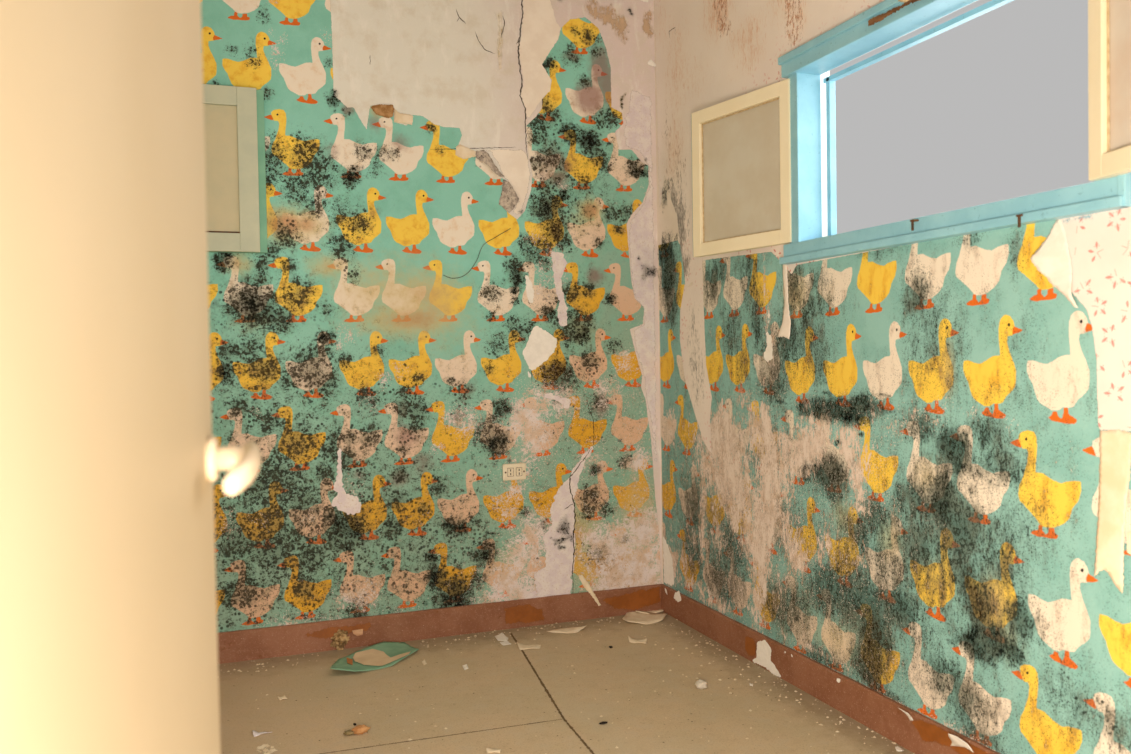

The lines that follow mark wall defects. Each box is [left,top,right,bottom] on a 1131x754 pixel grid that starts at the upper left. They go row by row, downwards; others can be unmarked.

leakage [587,0,653,39]
crack [431,0,528,159]
peeling [519,0,561,118]
leakage [562,126,611,151]
leakage [521,182,568,245]
leakage [638,233,677,298]
leakage [227,278,289,328]
leakage [776,391,891,437]
leakage [917,428,966,521]
peeling [504,446,594,624]
leakage [422,553,470,607]
leakage [951,567,1023,667]